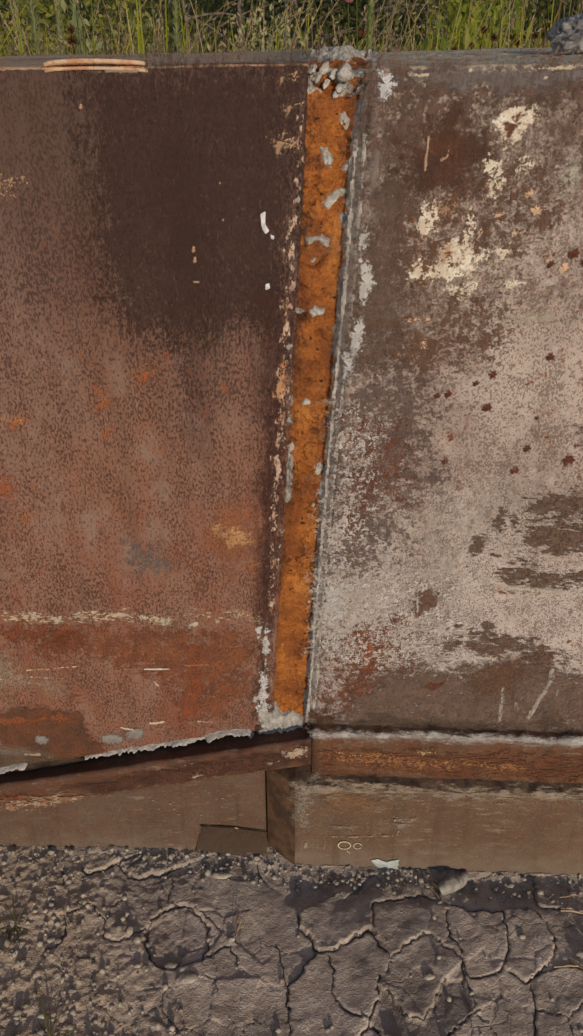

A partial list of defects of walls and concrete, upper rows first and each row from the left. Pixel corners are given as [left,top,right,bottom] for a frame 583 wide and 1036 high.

peeling [394,49,583,303]
spalling [260,44,379,615]
rust [309,42,583,720]
leakage [304,513,417,665]
rust [0,707,105,761]
rust [0,616,264,728]
peeling [253,626,272,722]
leakage [310,729,583,747]